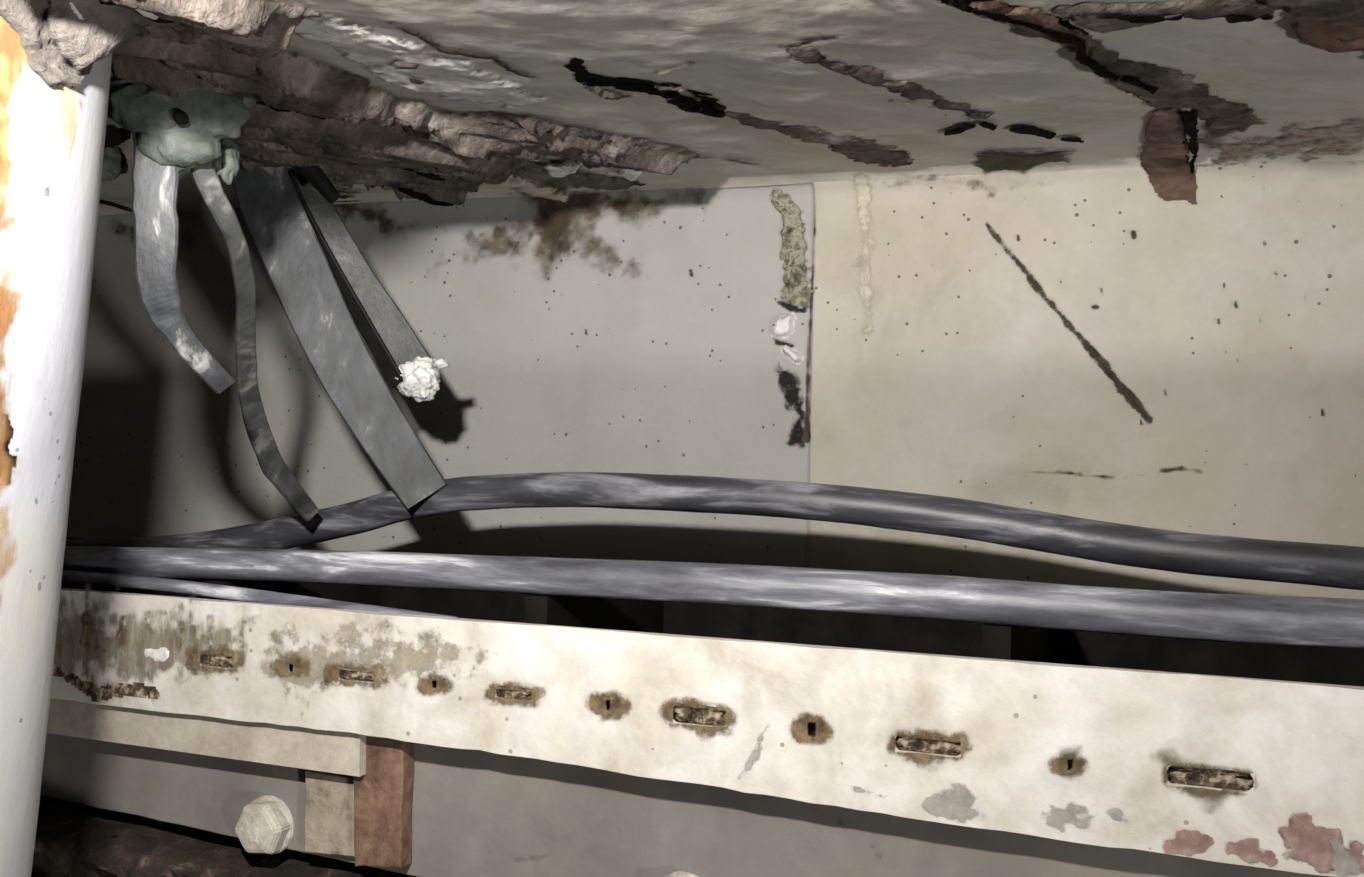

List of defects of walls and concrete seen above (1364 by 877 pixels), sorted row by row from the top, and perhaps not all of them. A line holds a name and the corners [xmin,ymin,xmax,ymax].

rust [0,16,28,226]
spalling [0,0,709,206]
crack [392,23,914,168]
crack [940,0,1274,205]
leakage [334,188,401,232]
crack [986,223,1152,423]
rust [53,667,160,702]
leakage [263,621,459,692]
rust [895,731,962,765]
peeling [922,783,978,822]
rust [1163,756,1254,802]
peeling [1163,813,1364,877]